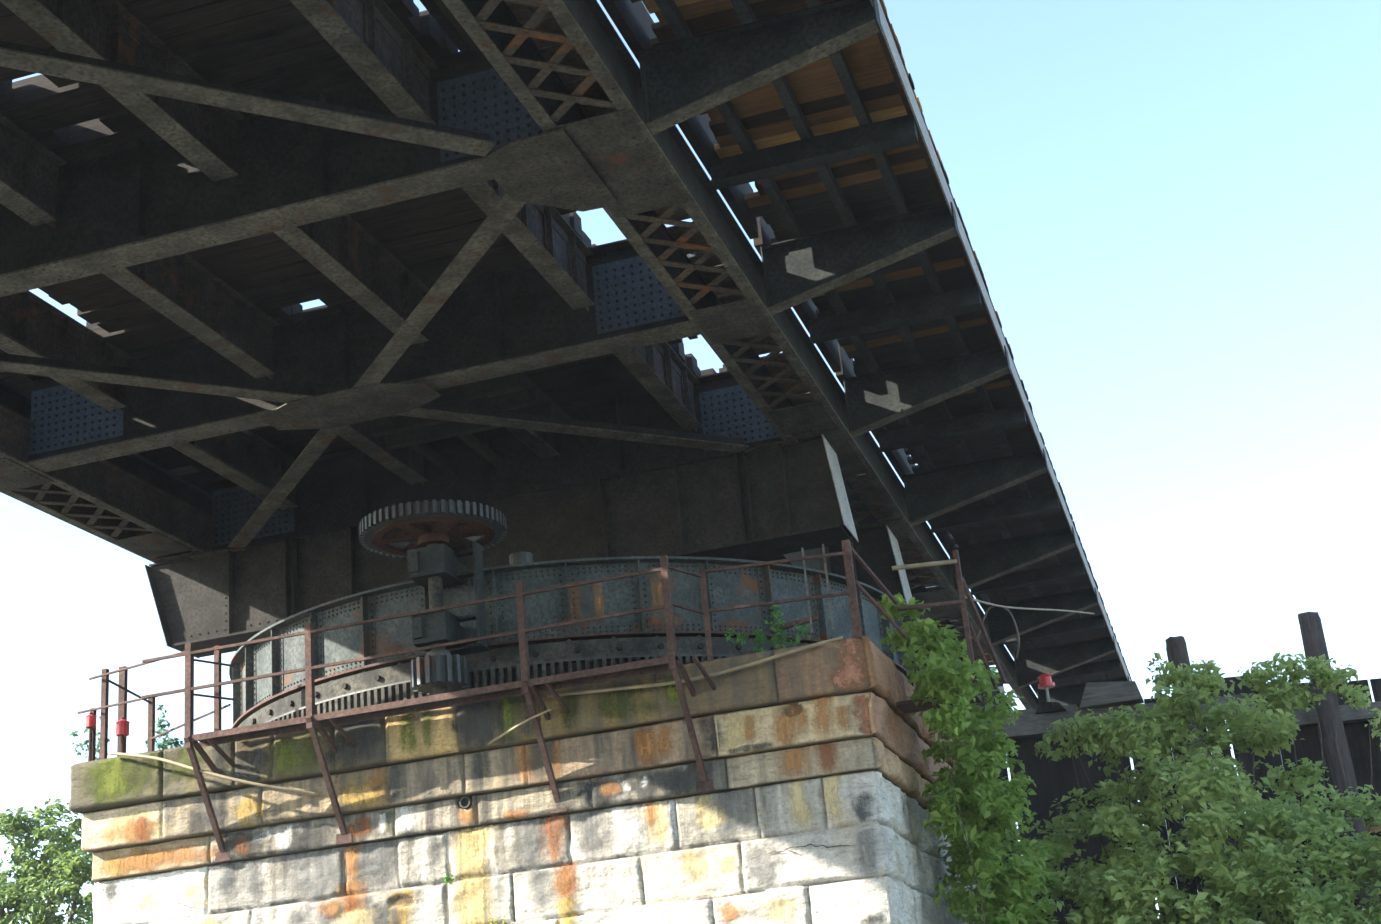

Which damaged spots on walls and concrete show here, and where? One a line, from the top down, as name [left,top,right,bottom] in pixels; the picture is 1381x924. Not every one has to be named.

rust [776,697,848,823]
rust [102,813,213,877]
rust [233,796,263,855]
rust [317,772,382,924]
rust [452,808,499,924]
rust [504,810,527,820]
rust [544,815,577,924]
crack [750,843,856,860]